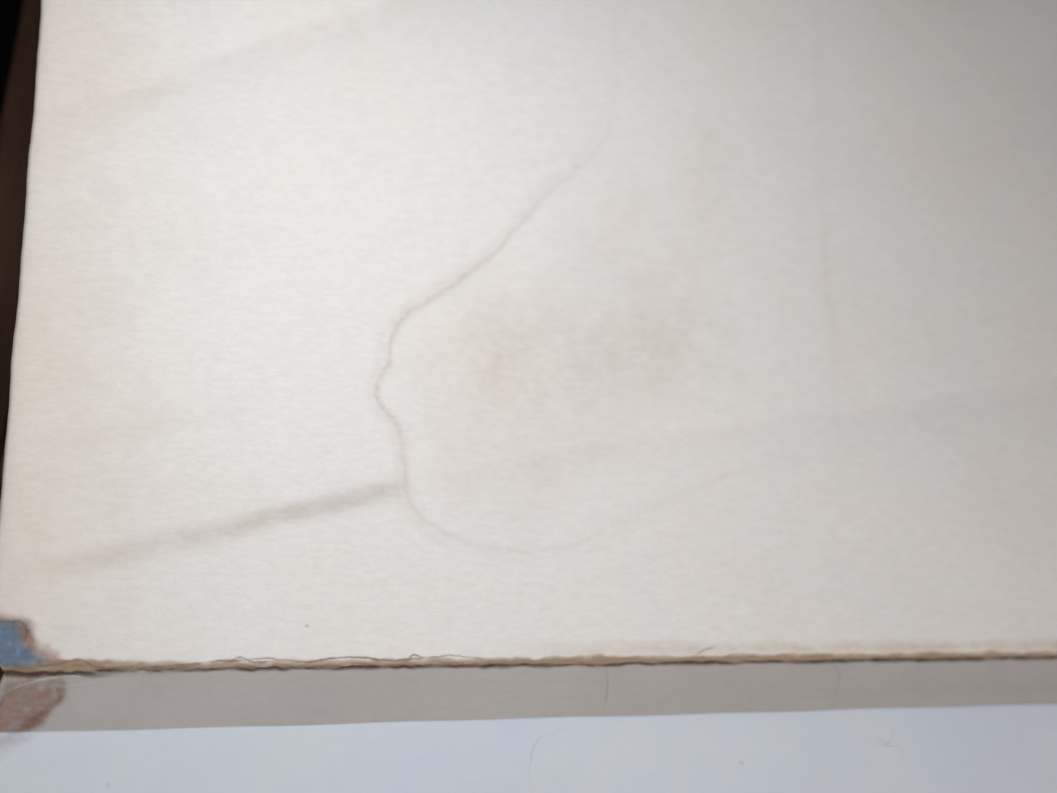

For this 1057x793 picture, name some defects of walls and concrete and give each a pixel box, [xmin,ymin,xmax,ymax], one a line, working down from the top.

peeling [296,654,422,663]